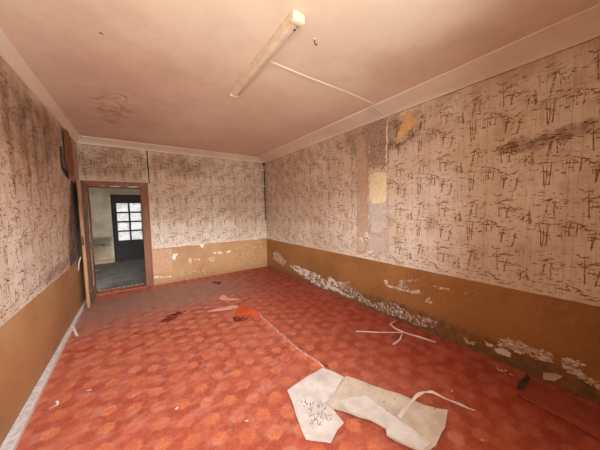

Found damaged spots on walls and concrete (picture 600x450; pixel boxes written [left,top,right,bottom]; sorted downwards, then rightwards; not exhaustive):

leakage [69,183,80,264]
leakage [290,265,438,328]
peeling [485,338,553,363]
peeling [543,358,600,390]